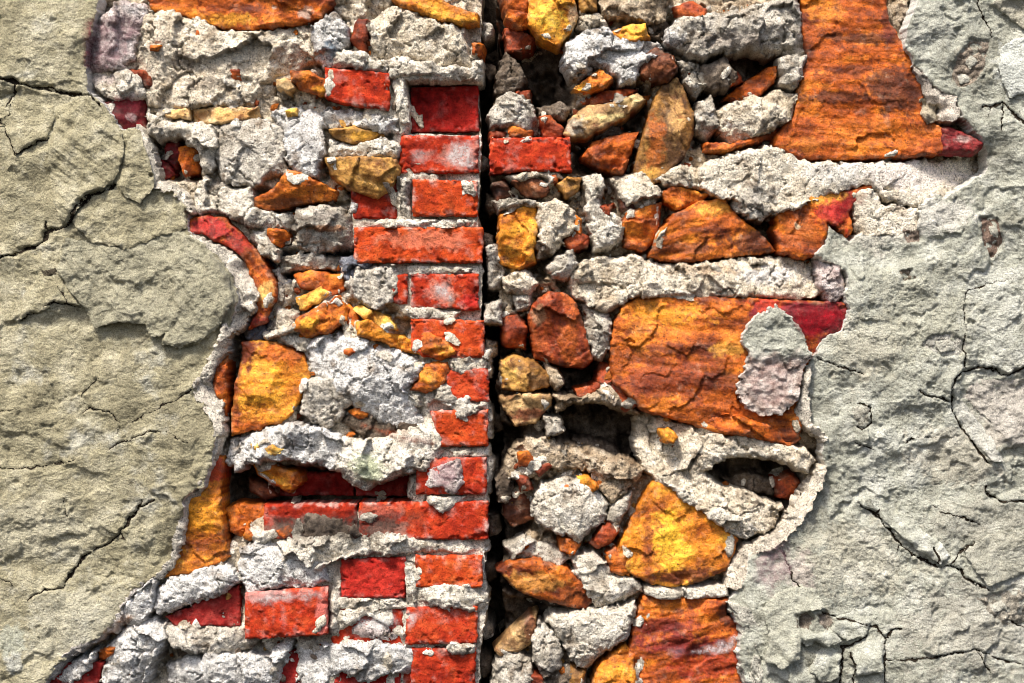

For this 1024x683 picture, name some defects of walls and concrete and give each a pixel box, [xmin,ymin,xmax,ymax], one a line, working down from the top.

peeling [910,0,1024,126]
crack [0,78,100,156]
crack [0,184,116,259]
spalling [903,229,920,243]
peeling [0,97,260,680]
peeling [735,303,828,444]
crack [918,278,1024,503]
crack [0,499,155,601]
peeling [722,463,884,683]
peeling [871,497,950,564]
crack [859,503,990,591]
crack [821,611,1024,683]